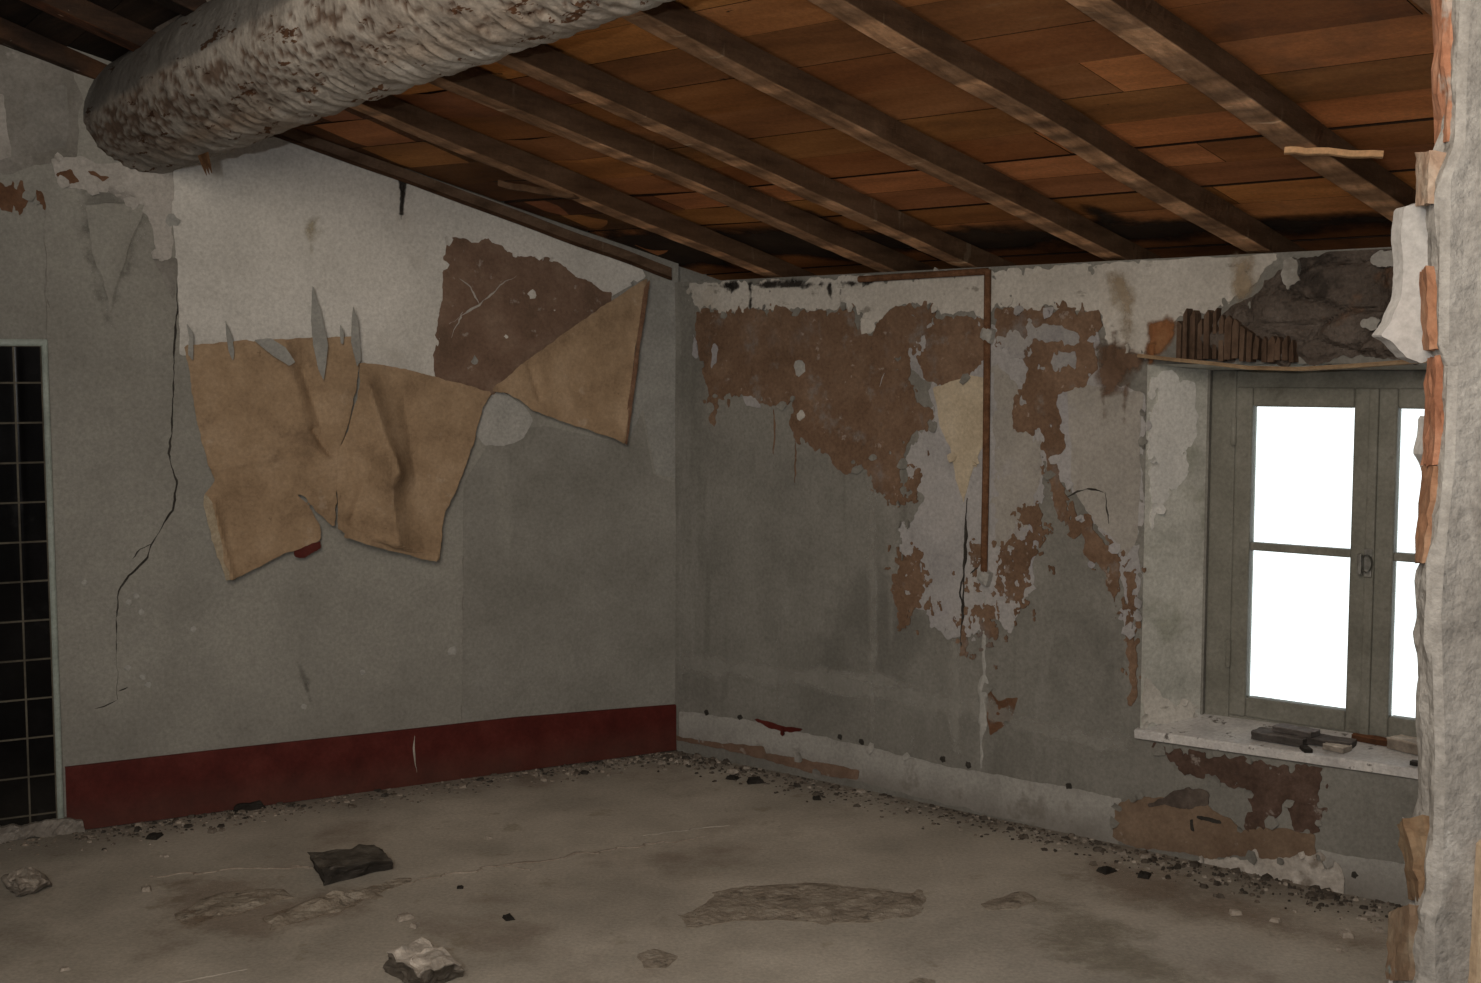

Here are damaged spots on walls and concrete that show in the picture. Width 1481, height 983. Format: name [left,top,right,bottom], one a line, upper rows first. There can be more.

flaking render [0,45,109,215]
crack [95,250,179,709]
flaking render [151,137,1433,906]
spalling [678,882,926,928]
spalling [981,891,1037,911]